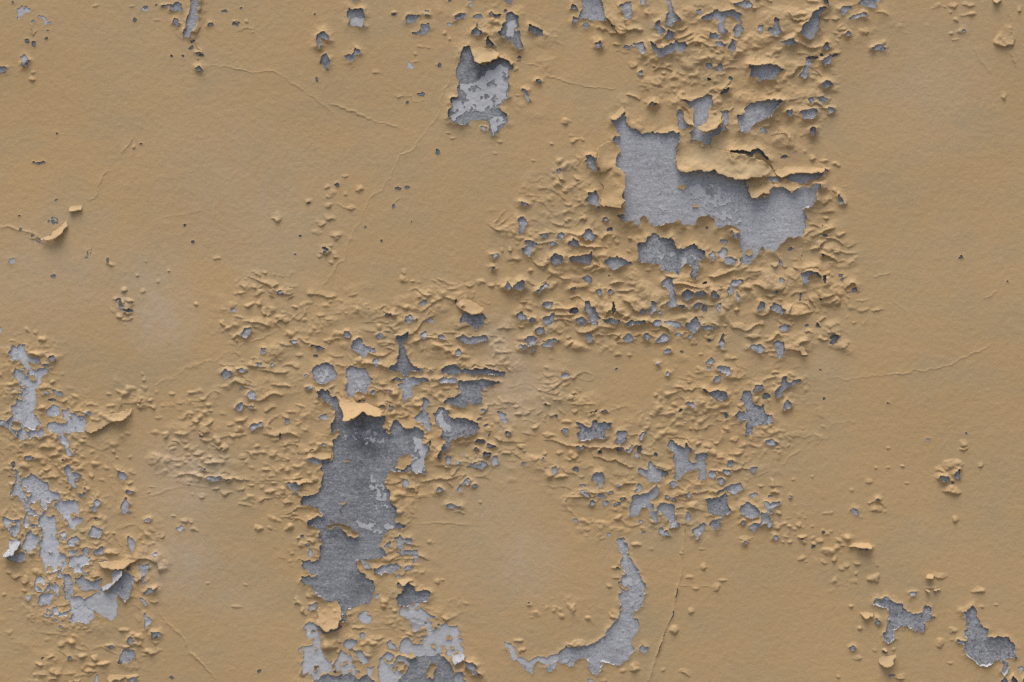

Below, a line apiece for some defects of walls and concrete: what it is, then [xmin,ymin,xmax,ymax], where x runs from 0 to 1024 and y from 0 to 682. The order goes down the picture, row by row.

peeling [390,0,548,144]
peeling [485,0,884,450]
peeling [0,327,166,682]
peeling [282,294,516,682]
peeling [518,402,794,550]
peeling [501,532,653,682]
crack [647,527,713,682]
peeling [860,576,941,678]
peeling [953,601,1024,682]